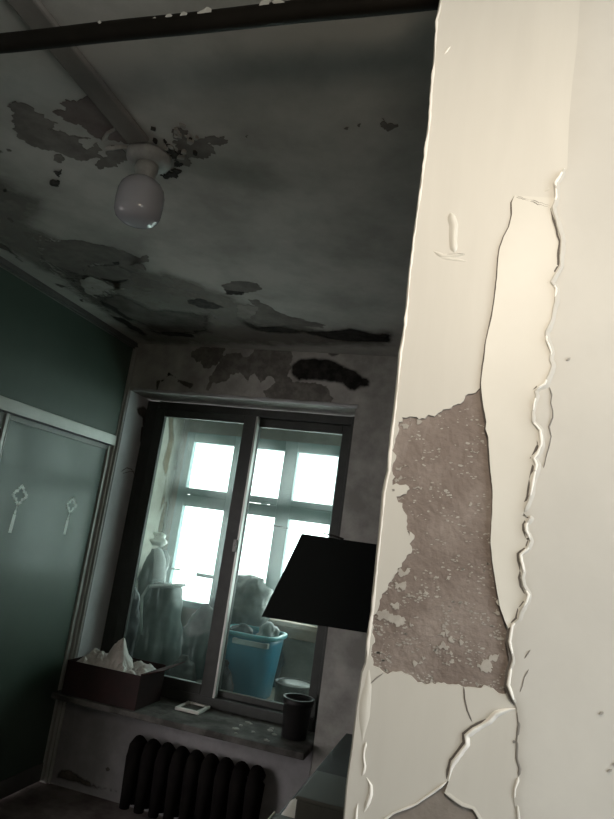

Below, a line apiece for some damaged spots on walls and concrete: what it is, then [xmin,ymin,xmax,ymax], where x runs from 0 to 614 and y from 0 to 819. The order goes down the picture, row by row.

peeling [7,96,132,187]
peeling [151,123,228,179]
water stain [0,182,390,390]
peeling [221,281,326,328]
peeling [191,347,334,402]
peeling [366,1,561,694]
crack [446,168,566,819]
crack [355,743,373,819]
peeling [384,781,482,819]